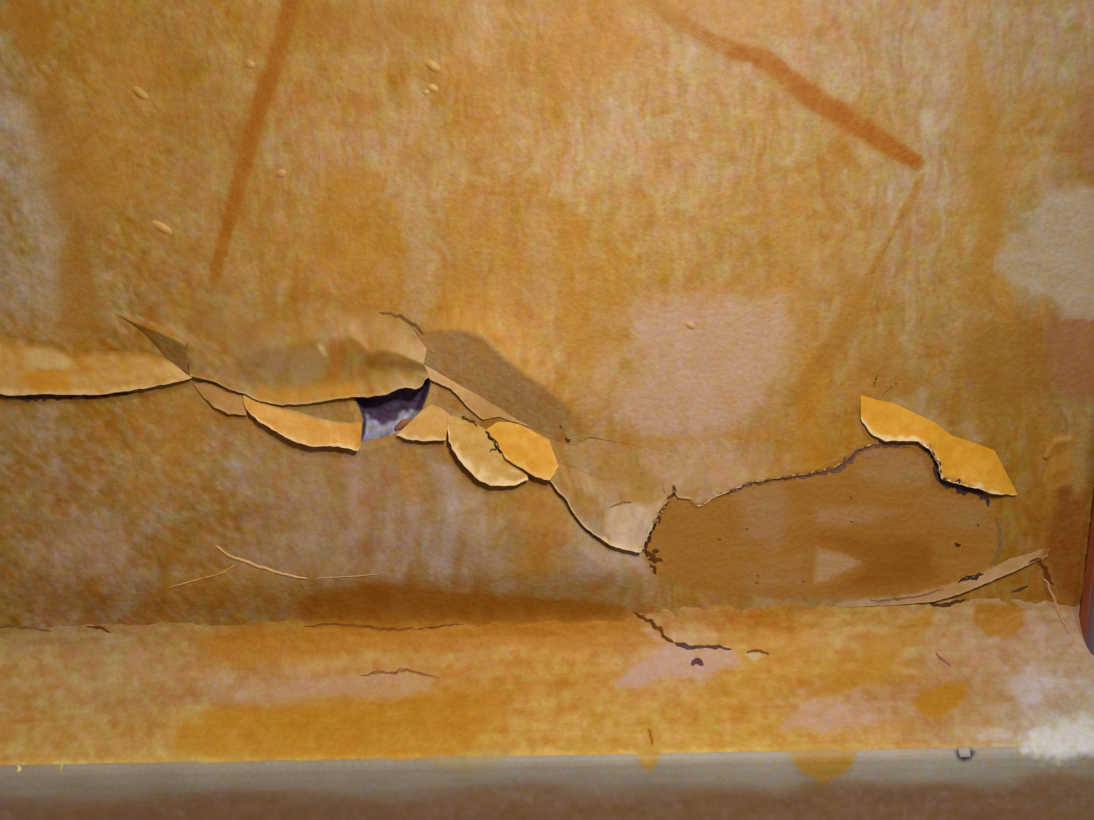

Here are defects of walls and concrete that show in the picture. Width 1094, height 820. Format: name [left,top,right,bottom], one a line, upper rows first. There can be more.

peeling [0,294,429,451]
spalling [397,395,1048,607]
leakage [164,680,519,782]
leakage [192,570,669,673]
crack [633,612,769,666]
leakage [796,604,938,704]
leakage [910,678,972,725]
leakage [968,598,1028,641]
leakage [971,662,1094,769]